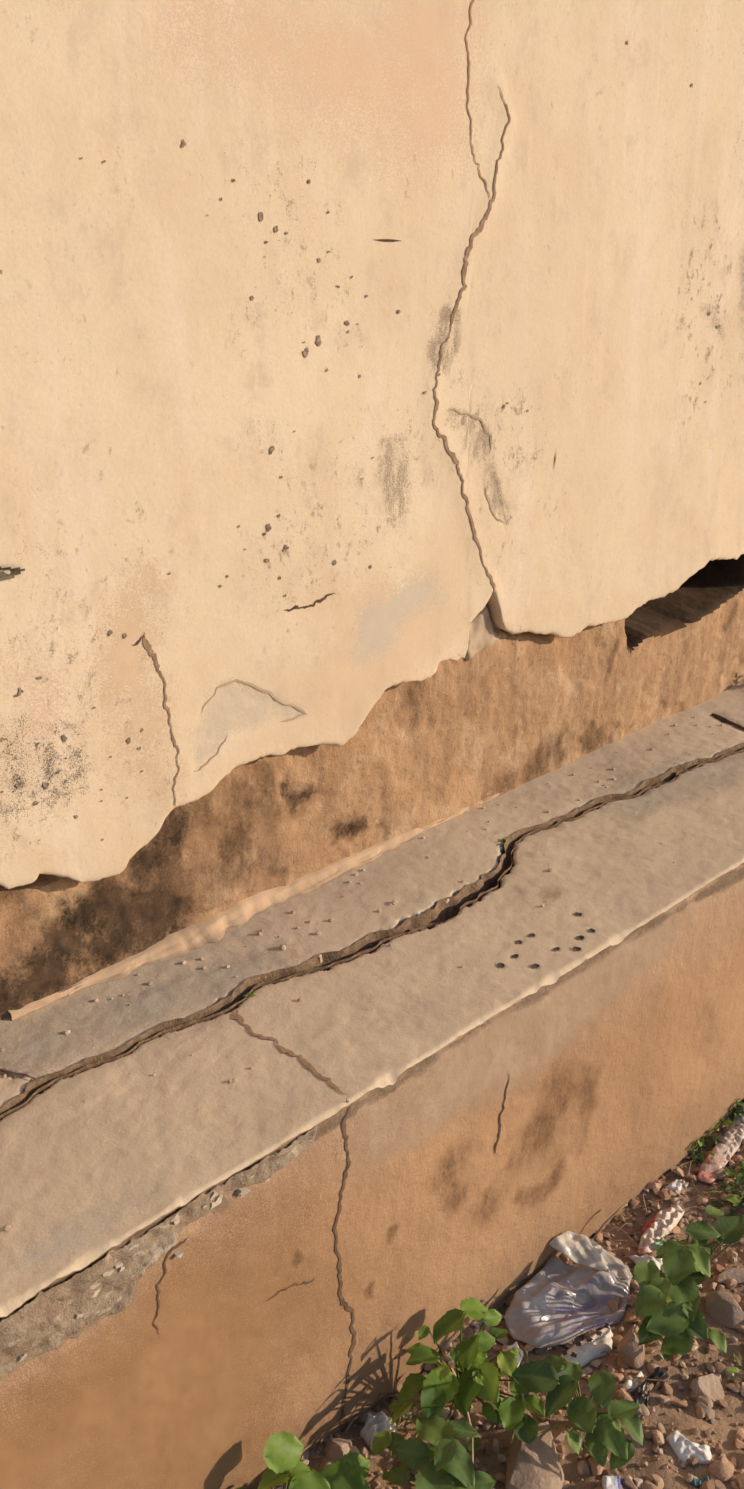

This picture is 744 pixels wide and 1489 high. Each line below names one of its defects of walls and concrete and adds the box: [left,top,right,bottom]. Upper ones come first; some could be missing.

crack [433,0,511,590]
peeling [444,404,510,522]
crack [133,632,180,806]
water stain [0,549,313,1086]
flaking render [0,554,744,1021]
spalling [0,1125,318,1381]
crack [0,713,744,1432]